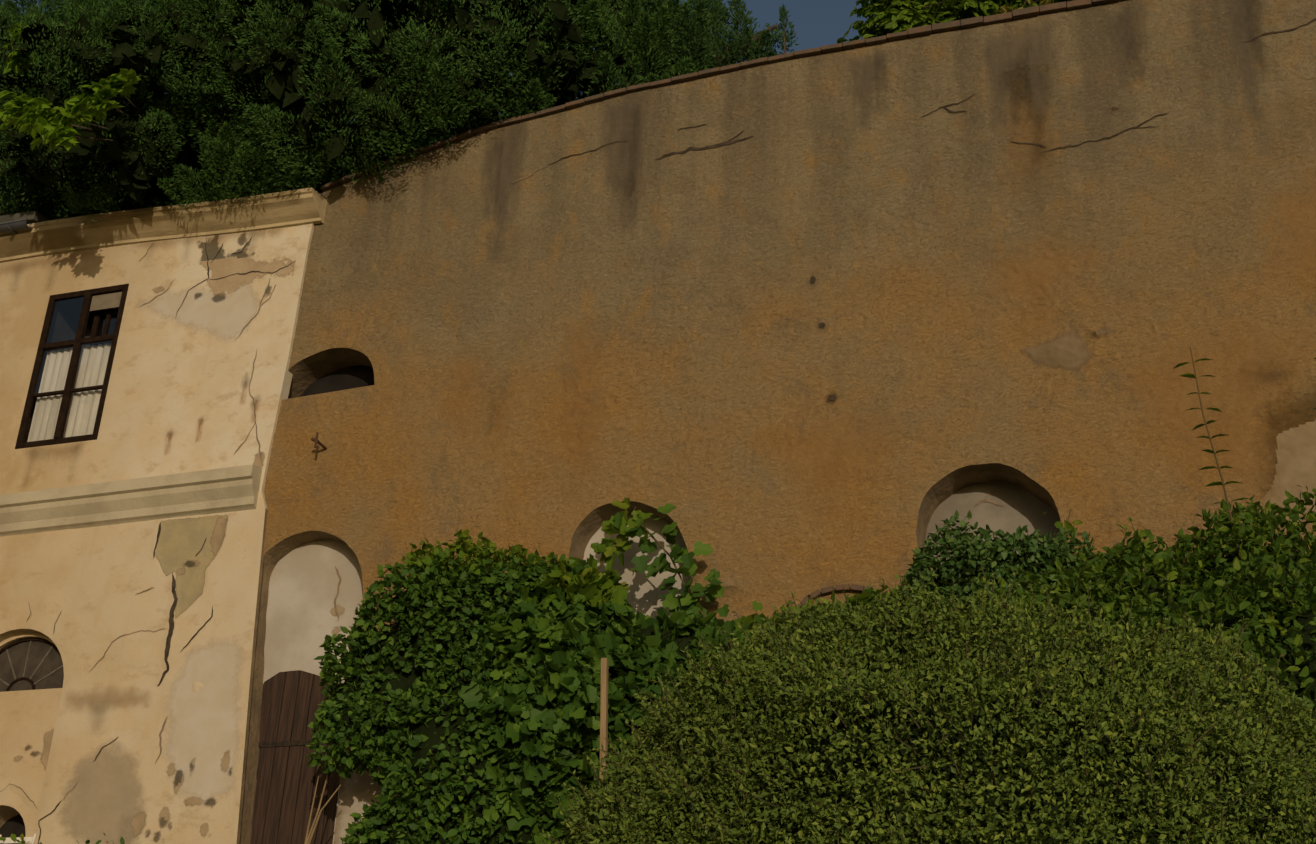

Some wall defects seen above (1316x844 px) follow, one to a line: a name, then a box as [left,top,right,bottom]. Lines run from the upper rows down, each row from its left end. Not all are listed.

crack [512,141,626,183]
crack [655,124,754,160]
crack [1012,113,1168,151]
spalling [200,256,295,296]
crack [139,237,294,464]
spalling [1270,419,1316,520]
spalling [149,515,228,618]
crack [91,573,213,686]
crack [0,736,119,843]
crack [155,716,168,764]